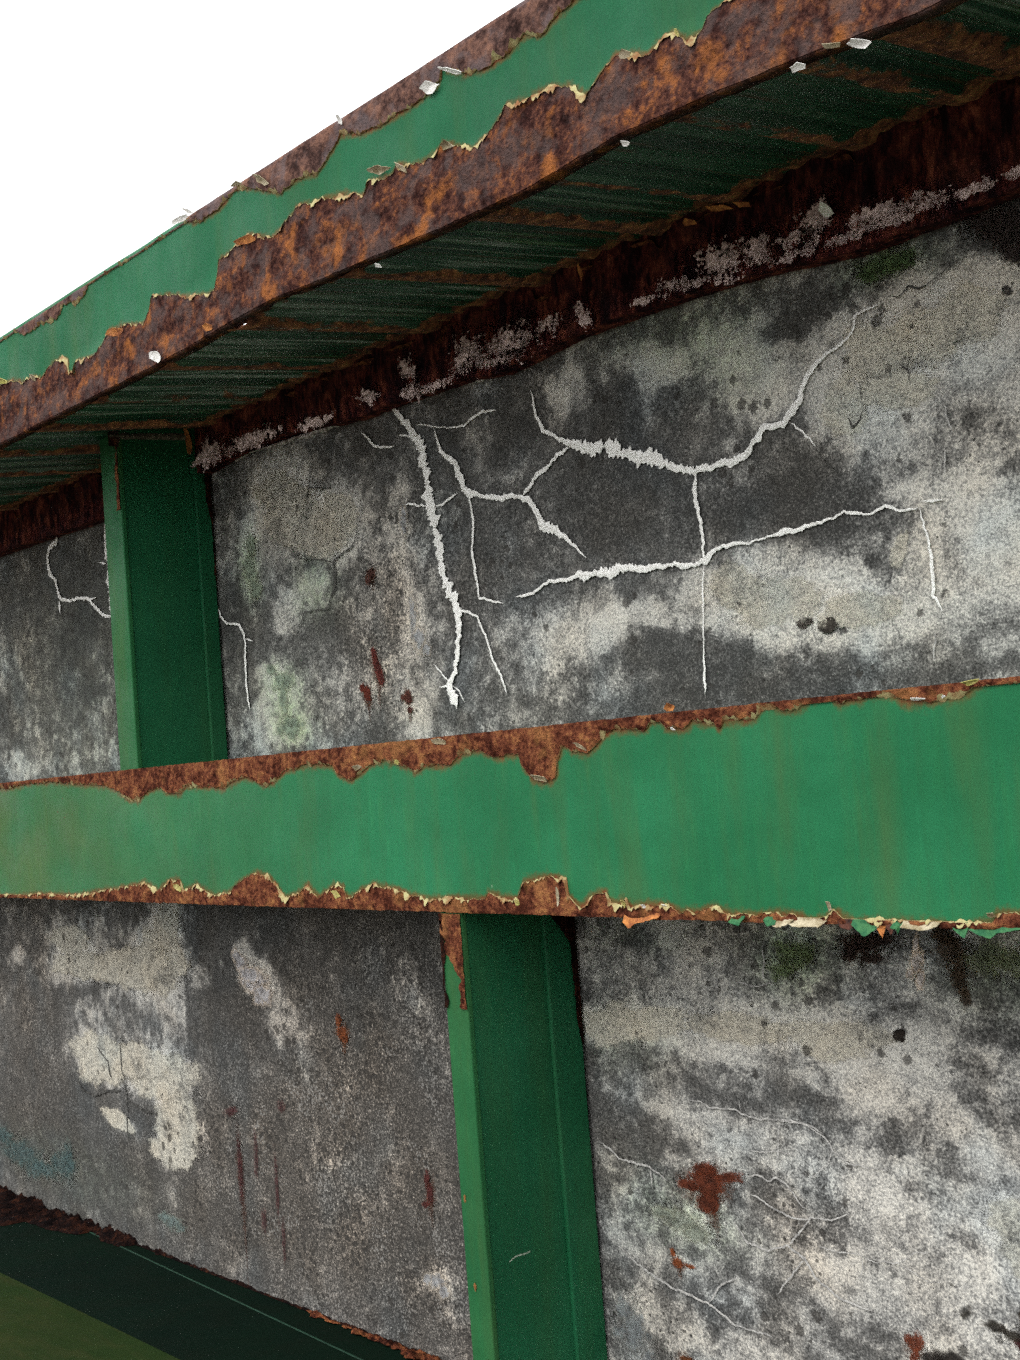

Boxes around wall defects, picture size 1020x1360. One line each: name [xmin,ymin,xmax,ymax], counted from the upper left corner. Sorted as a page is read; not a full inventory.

rust [0,0,940,443]
water stain [967,202,1020,263]
rust [184,76,1020,579]
peeling [821,281,1012,438]
crack [362,256,966,709]
crack [46,525,111,618]
peeling [710,560,901,633]
peeling [889,533,908,568]
crack [218,607,252,709]
rust [0,676,1020,802]
water stain [921,1350,964,1360]
water stain [984,1314,1020,1341]